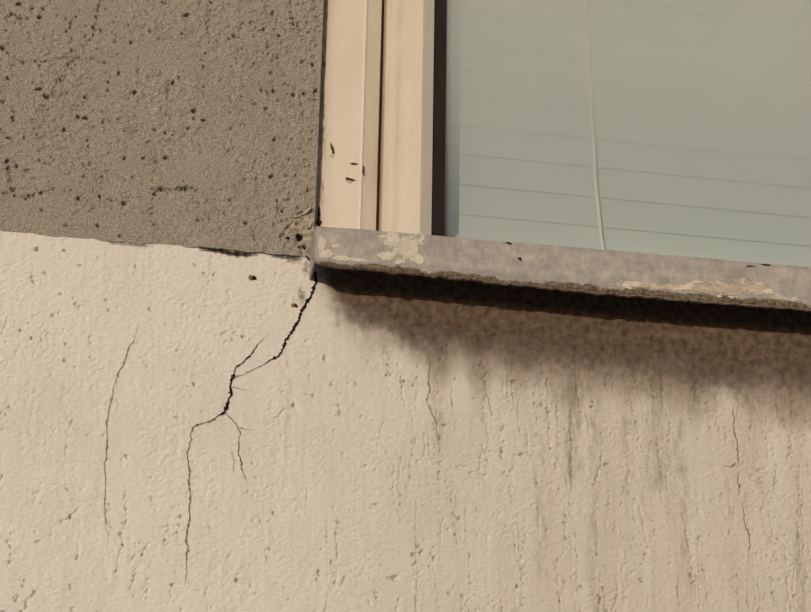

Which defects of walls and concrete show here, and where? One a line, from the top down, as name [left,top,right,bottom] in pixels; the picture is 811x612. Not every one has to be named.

peeling [284,207,425,265]
leakage [324,266,811,403]
peeling [605,264,799,302]
crack [185,247,318,581]